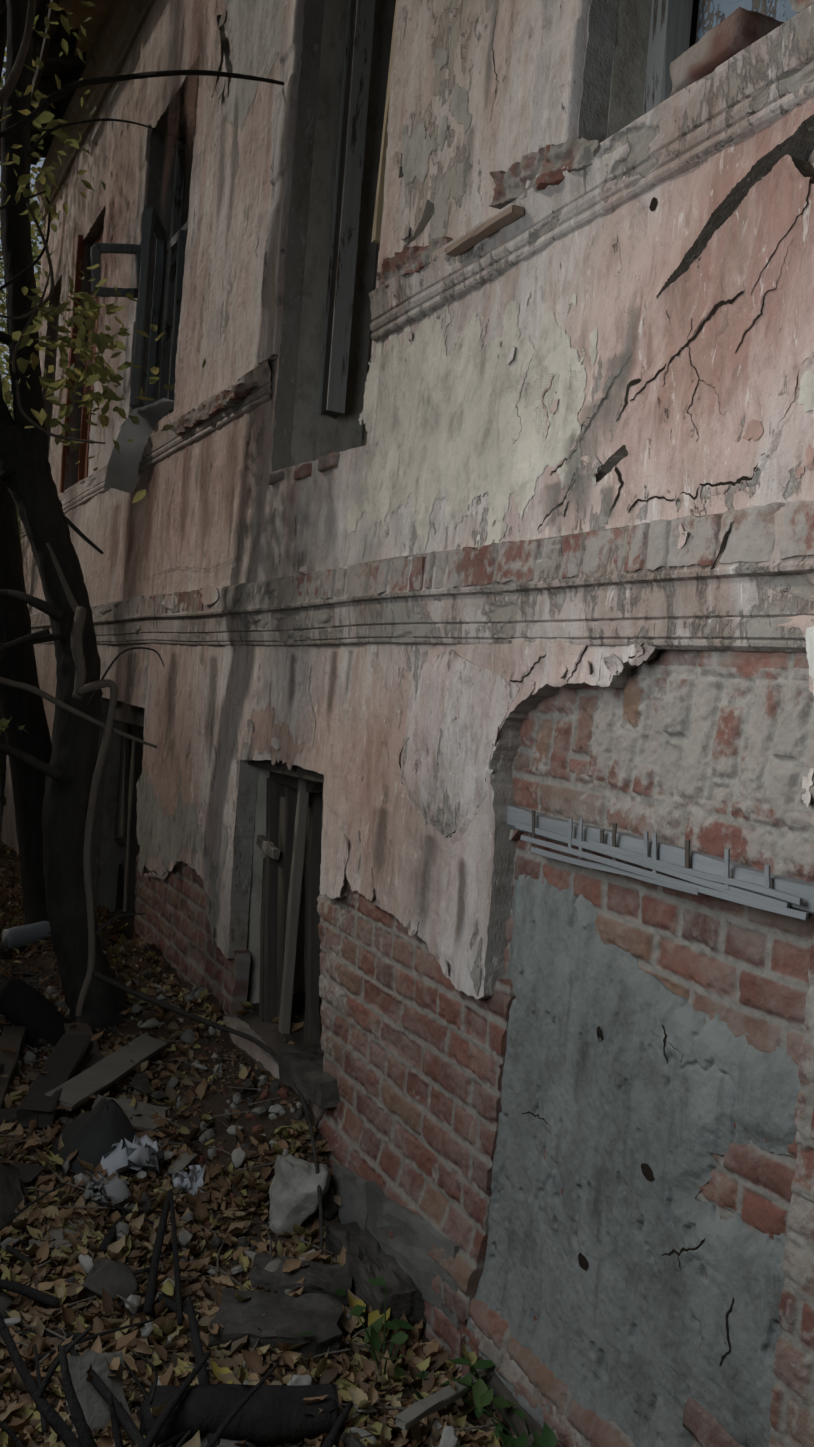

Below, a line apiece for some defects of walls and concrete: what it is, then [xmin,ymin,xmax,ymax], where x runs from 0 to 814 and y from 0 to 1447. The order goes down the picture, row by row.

spalling [376,236,454,288]
spalling [489,137,602,209]
peeling [292,293,814,600]
crack [511,149,814,570]
flaking render [134,770,250,1017]
flaking render [509,829,523,840]
flaking render [512,626,814,882]
flaking render [316,885,516,1376]
flaking render [769,913,814,1447]